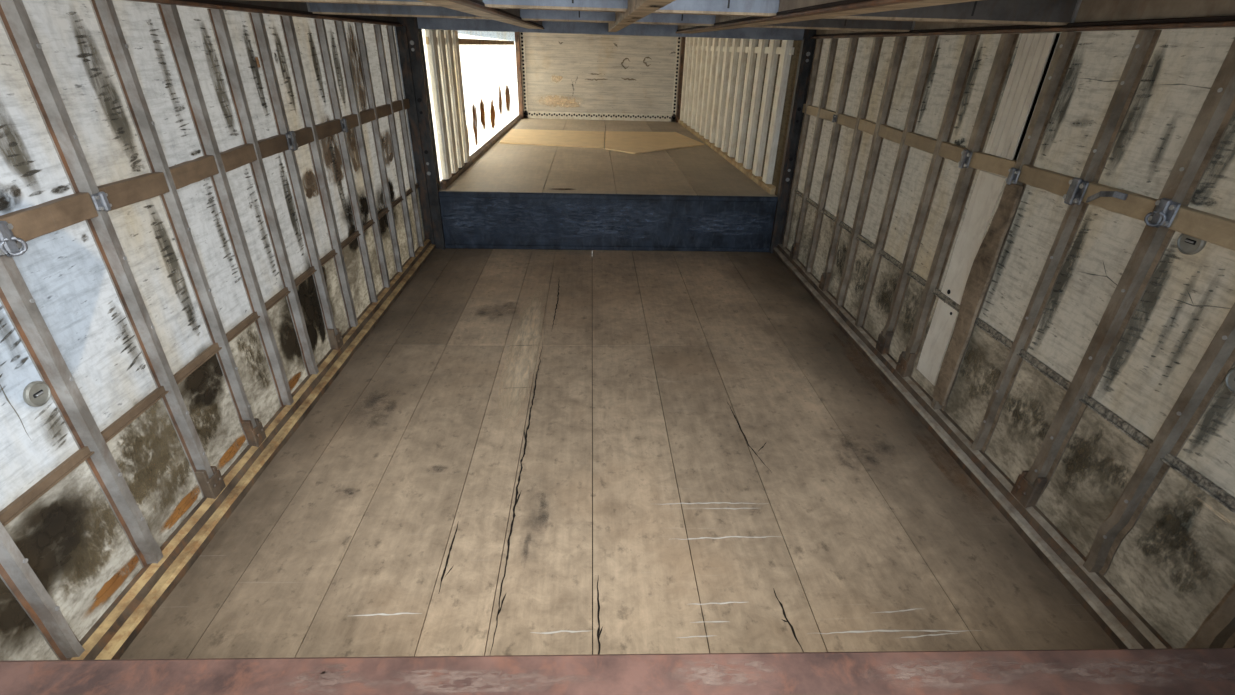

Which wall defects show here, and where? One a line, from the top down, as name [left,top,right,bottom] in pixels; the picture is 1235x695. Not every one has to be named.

water stain [0,118,69,211]
water stain [203,178,241,283]
water stain [245,173,279,276]
water stain [276,119,396,365]
mould [184,354,224,449]
water stain [238,332,269,387]
water stain [117,403,189,508]
crack [490,284,559,654]
mould [14,497,117,596]
mould [1137,488,1208,591]
water stain [0,578,39,645]
crack [773,588,804,652]